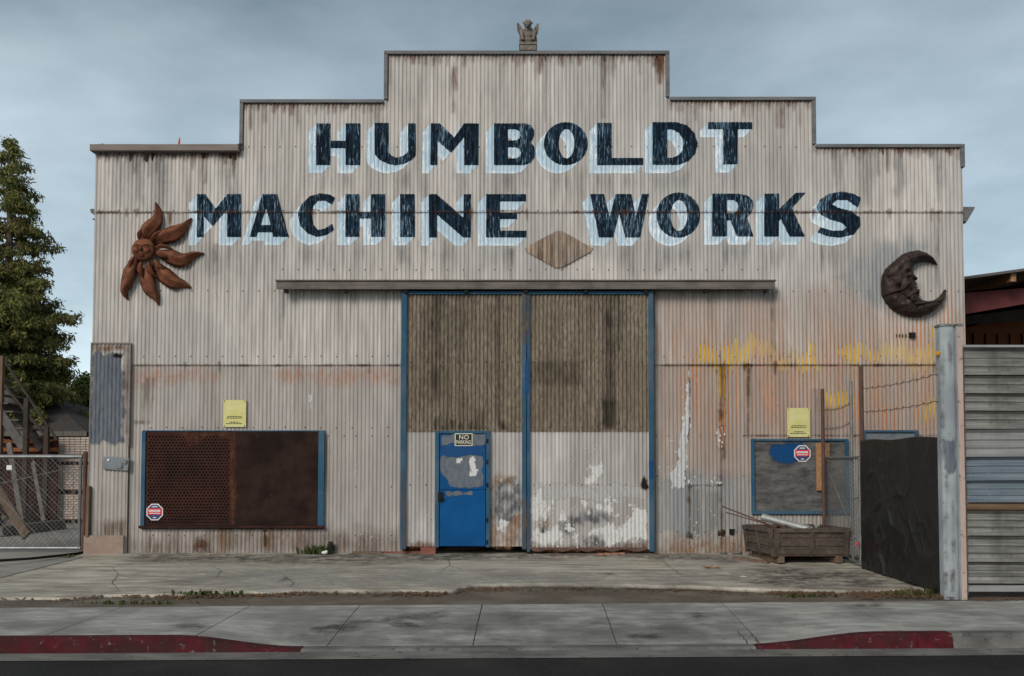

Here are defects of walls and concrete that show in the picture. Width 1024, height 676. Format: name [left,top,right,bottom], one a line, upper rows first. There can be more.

peeling [530,444,649,548]
peeling [658,370,726,537]